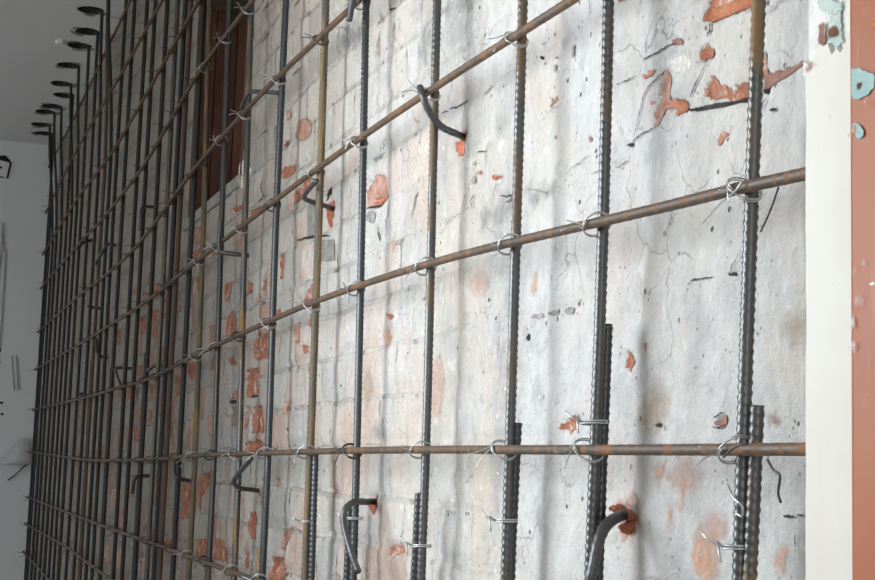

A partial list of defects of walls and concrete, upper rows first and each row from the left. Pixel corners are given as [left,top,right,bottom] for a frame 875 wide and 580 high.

spalling [703,0,752,25]
crack [568,25,714,173]
spalling [654,71,689,126]
spalling [689,76,749,112]
spalling [762,53,803,95]
peeling [851,68,875,99]
spalling [366,174,389,209]
crack [688,253,739,284]
corrosion [431,359,443,413]
spalling [346,504,363,559]
spalling [608,494,640,540]
spalling [343,545,357,580]